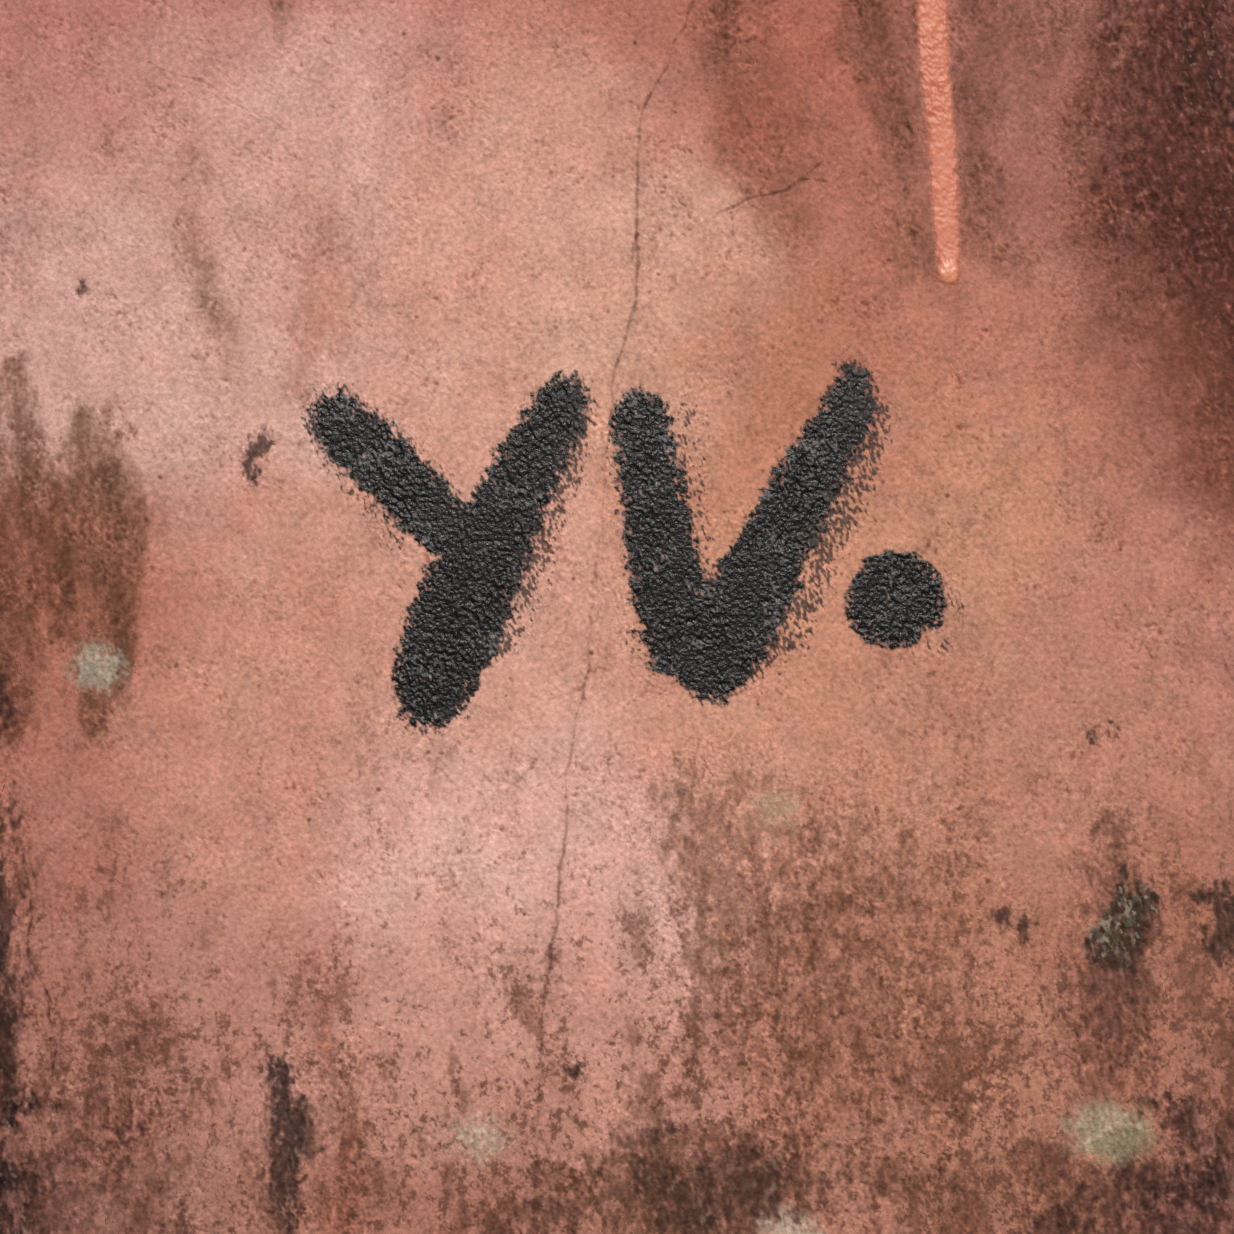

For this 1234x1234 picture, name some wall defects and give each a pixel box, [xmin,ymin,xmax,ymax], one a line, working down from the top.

crack [610,0,696,412]
crack [715,162,832,256]
leakage [947,0,1234,618]
crack [532,464,606,1209]
leakage [0,342,1234,1234]
crack [682,1017,696,1092]